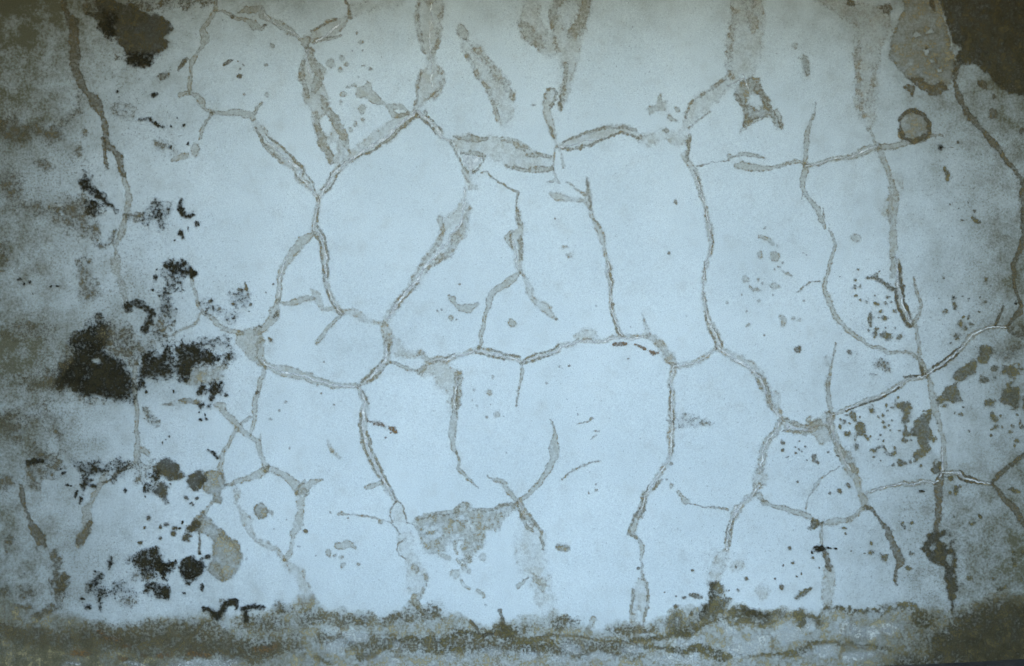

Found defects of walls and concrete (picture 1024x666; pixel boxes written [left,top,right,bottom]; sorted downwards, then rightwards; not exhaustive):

crack [61,0,132,240]
mould [1,129,199,248]
mould [0,257,236,505]
damp [83,0,212,98]
mould [198,282,252,322]
crack [177,2,466,524]
crack [419,61,1024,649]
mould [854,269,902,340]
mould [838,342,1024,467]
damp [939,0,1024,96]
crack [19,366,150,620]
damp [0,516,1024,666]